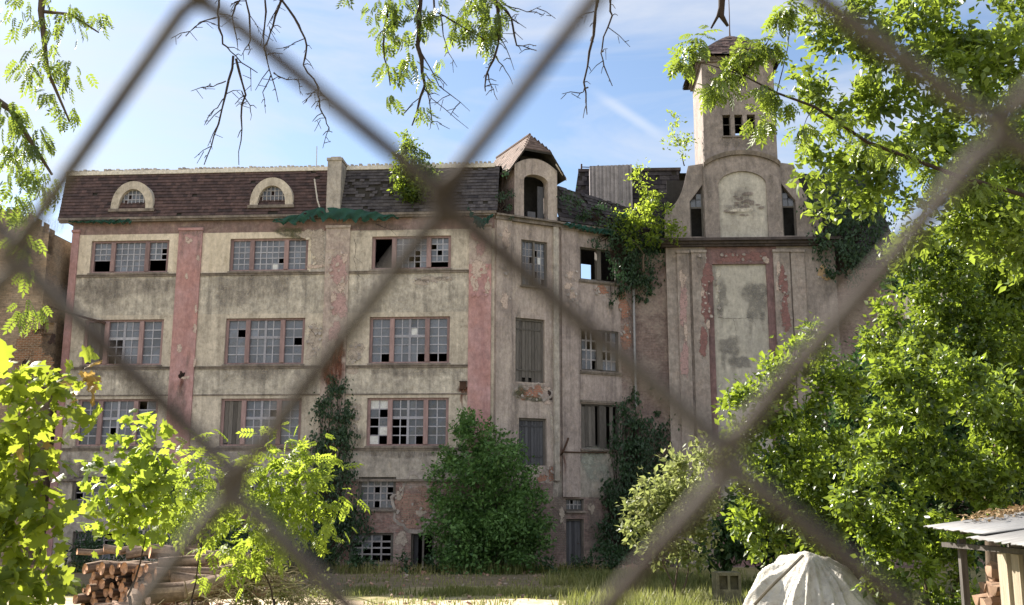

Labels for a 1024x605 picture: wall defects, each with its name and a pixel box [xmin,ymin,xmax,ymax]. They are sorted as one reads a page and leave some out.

peeling [470,245,511,309]
peeling [679,251,793,378]
water stain [720,338,750,367]
flaking render [512,382,553,404]
flaking render [390,471,435,546]